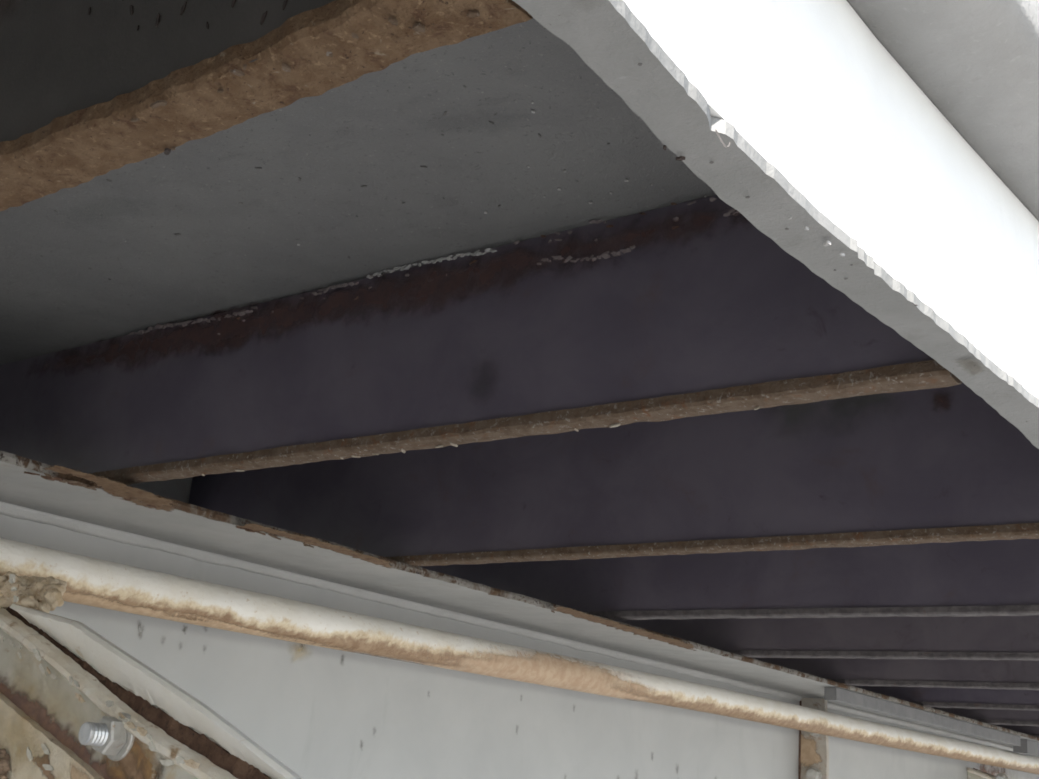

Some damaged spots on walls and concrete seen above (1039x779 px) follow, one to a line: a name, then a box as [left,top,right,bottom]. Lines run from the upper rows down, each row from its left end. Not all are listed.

rust [24,465,176,512]
rust [236,524,393,568]
rust [551,606,696,651]
rust [0,571,376,779]
rust [400,652,653,701]
rust [798,730,822,779]